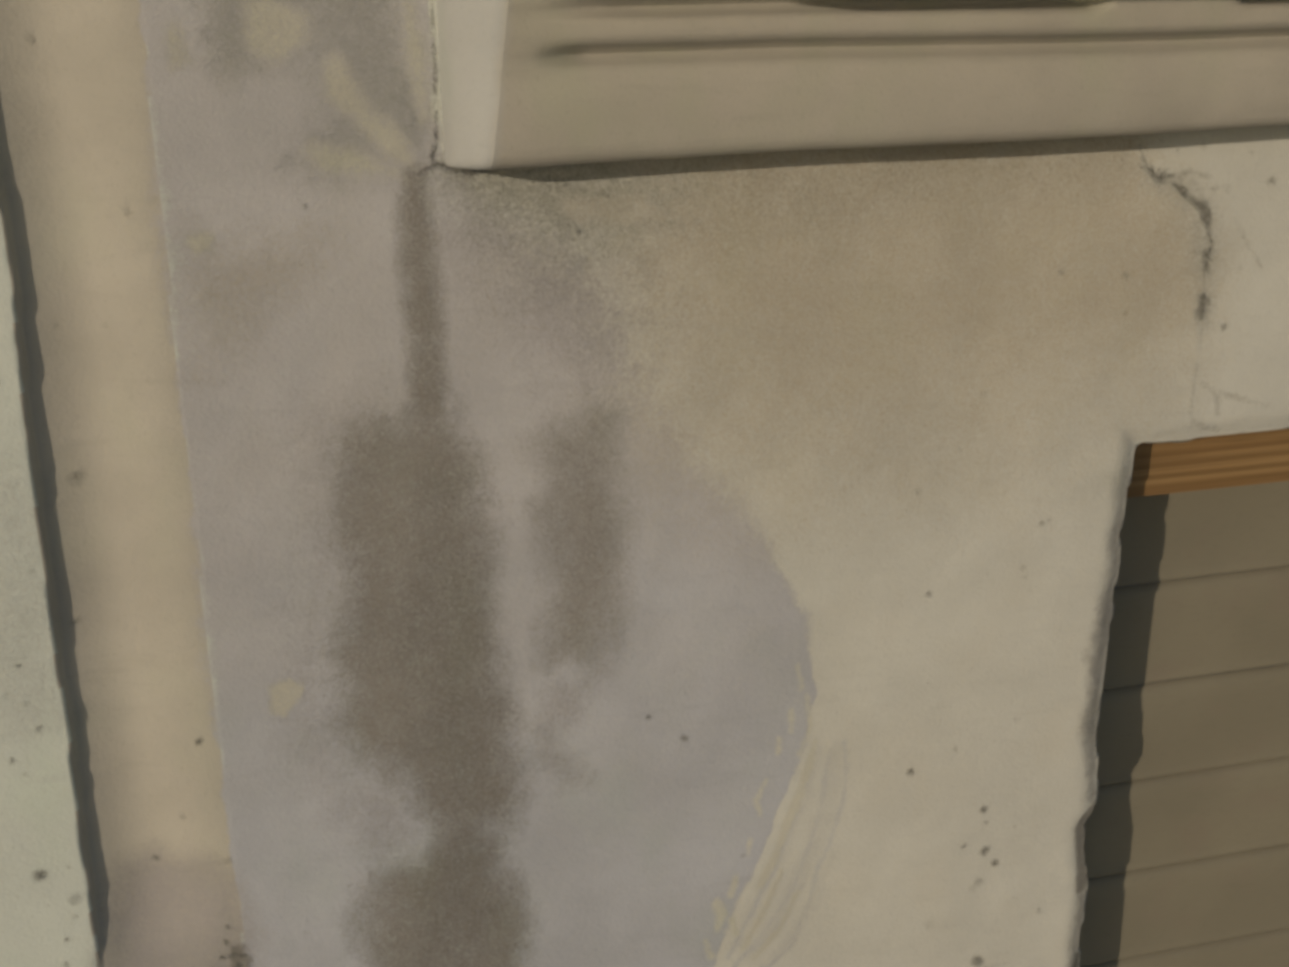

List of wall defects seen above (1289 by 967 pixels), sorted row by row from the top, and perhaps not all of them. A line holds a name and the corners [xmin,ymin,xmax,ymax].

crack [1138,145,1271,434]